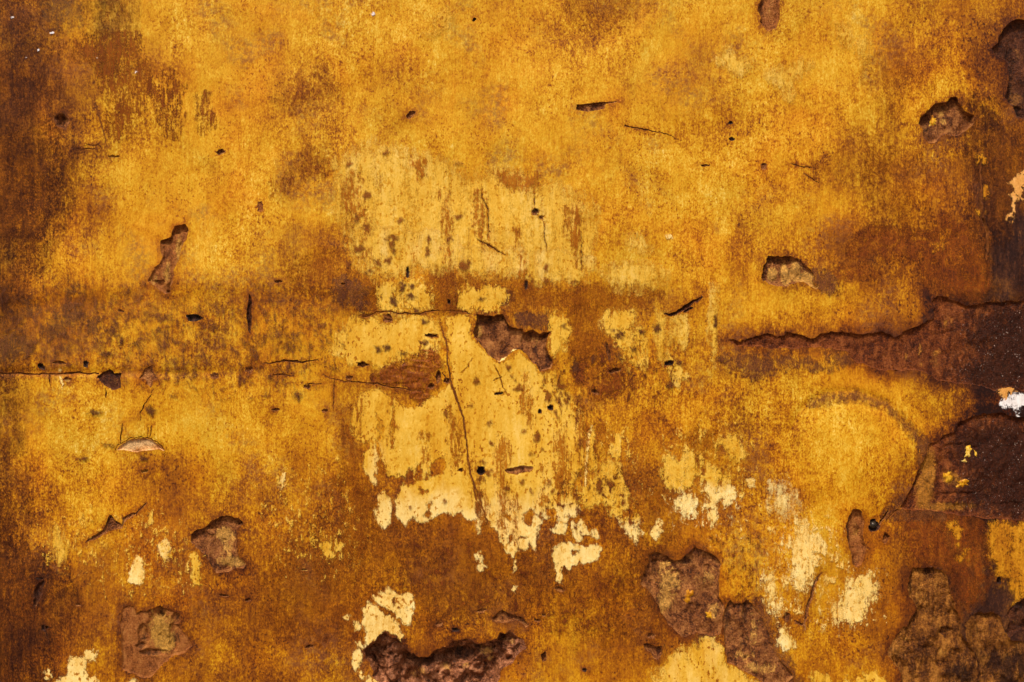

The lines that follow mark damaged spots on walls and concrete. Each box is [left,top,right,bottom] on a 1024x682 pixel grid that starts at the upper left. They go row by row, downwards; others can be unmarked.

spalling [754,0,784,36]
spalling [916,93,978,146]
spalling [988,16,1024,125]
spalling [144,220,192,299]
crack [0,368,169,462]
crack [259,268,507,528]
peeling [324,137,1024,682]
corrosion [716,348,854,382]
peeling [251,463,360,581]
spalling [29,498,255,682]